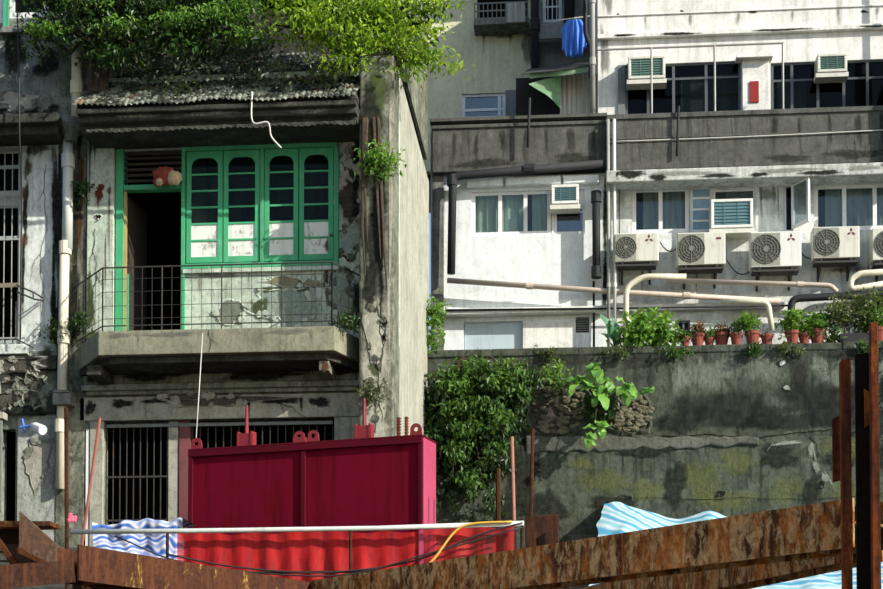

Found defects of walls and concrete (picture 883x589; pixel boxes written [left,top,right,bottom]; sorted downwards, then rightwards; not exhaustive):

flaking render [0,88,44,114]
damp [336,71,393,437]
flaking render [212,142,389,433]
spalling [0,356,53,412]
damp [124,374,187,382]
damp [223,372,306,381]
damp [625,348,867,434]
flaking render [22,436,54,497]
damp [617,447,675,457]
damp [590,461,756,511]
damp [761,441,832,504]